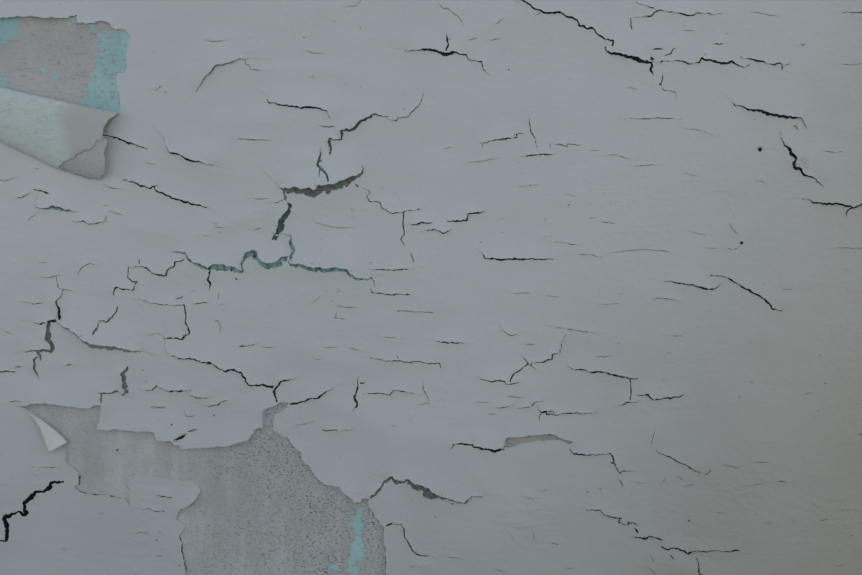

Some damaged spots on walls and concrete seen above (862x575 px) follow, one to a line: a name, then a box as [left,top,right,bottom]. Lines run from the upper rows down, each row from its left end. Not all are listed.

peeling [0,11,133,180]
crack [0,481,64,542]
peeling [17,398,390,575]